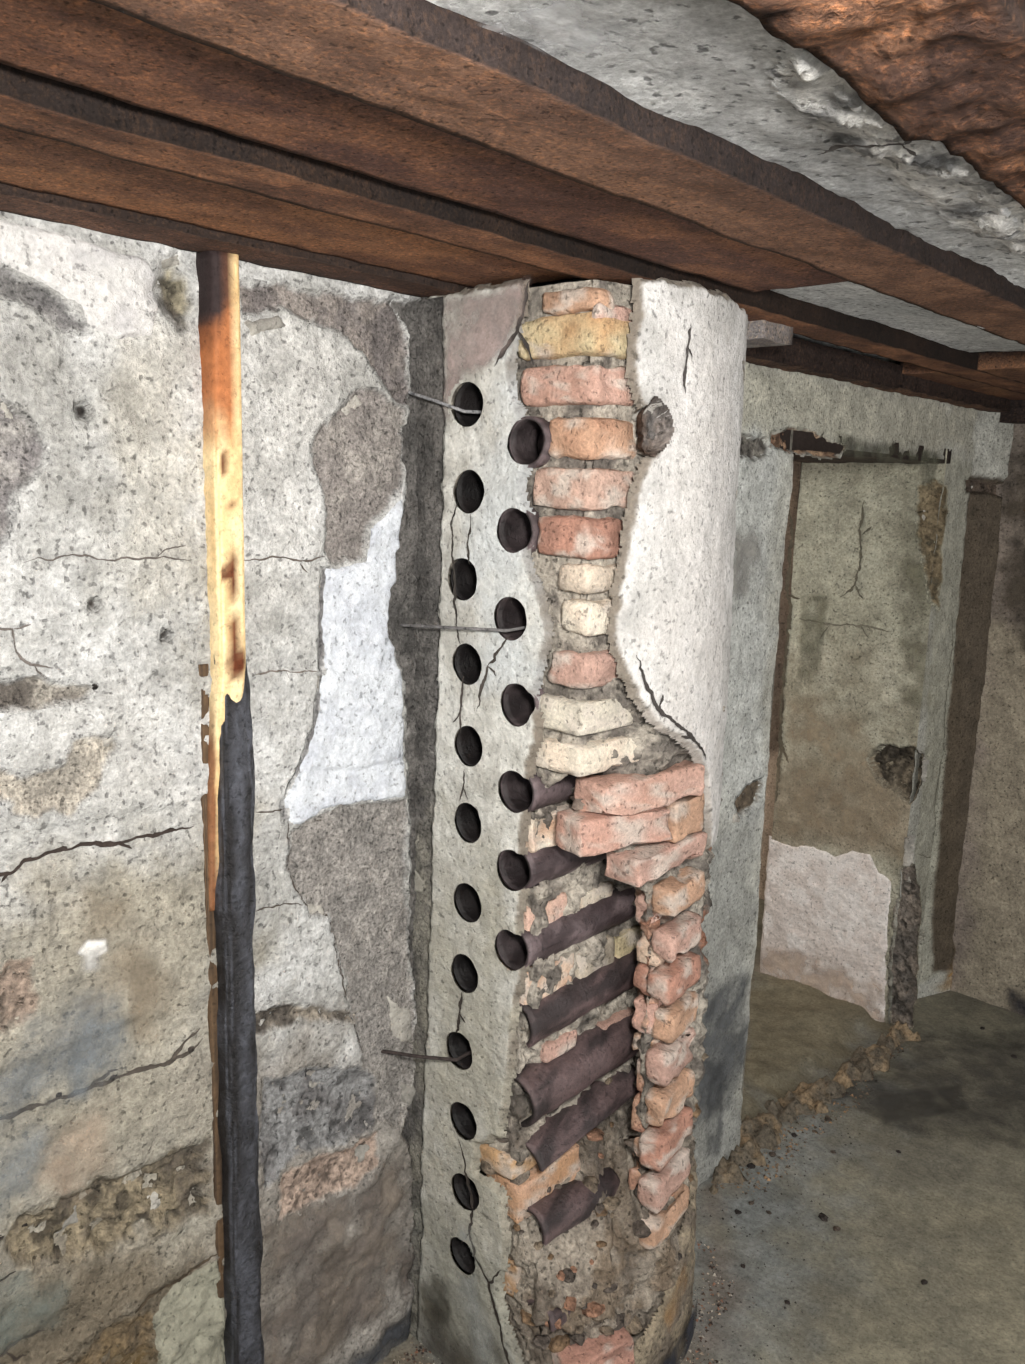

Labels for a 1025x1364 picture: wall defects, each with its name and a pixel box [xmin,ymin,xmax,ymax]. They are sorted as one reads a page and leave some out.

flaking render [632,396,675,457]
damp [1003,540,1025,648]
crack [636,655,706,758]
flaking render [866,743,929,804]
crack [0,826,193,882]
crack [0,1029,202,1120]